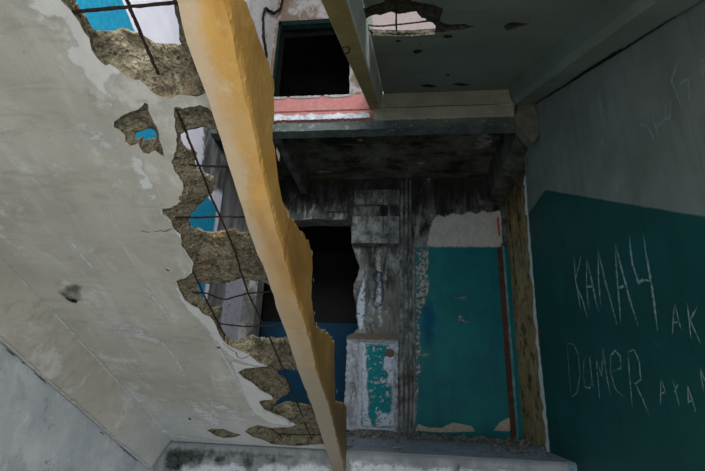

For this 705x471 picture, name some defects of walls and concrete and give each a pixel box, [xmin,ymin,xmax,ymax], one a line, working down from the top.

spalling [364,0,470,42]
spalling [28,0,205,107]
spalling [116,103,164,154]
peeling [274,112,370,121]
peeling [130,155,156,200]
spalling [159,105,324,444]
peeling [415,210,502,398]
peeling [356,341,395,431]
peeling [416,422,475,433]
peeling [494,418,510,431]